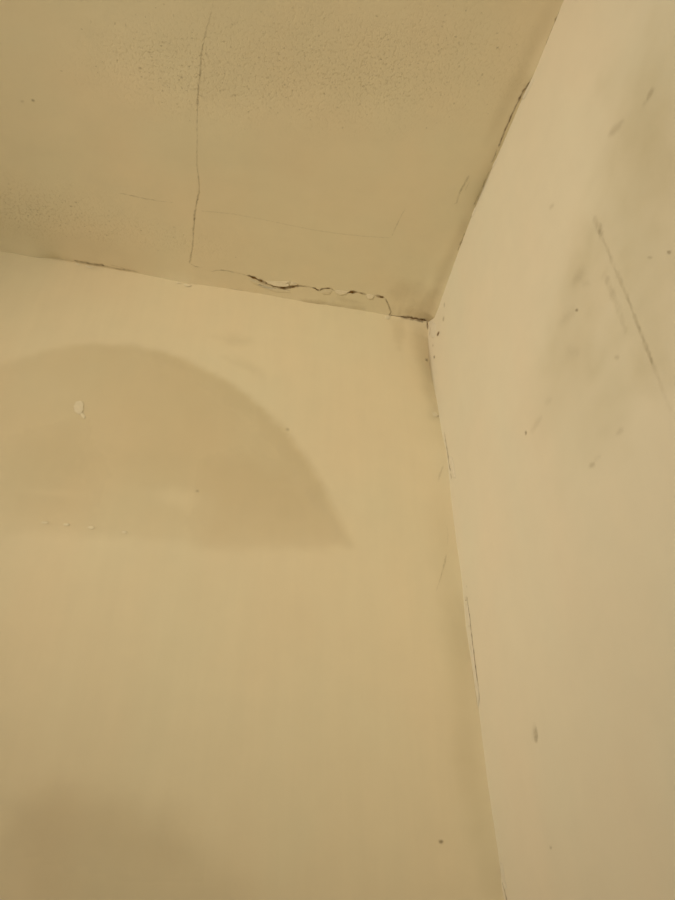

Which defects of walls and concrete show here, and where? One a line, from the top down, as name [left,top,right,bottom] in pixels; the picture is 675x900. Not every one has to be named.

crack [249,275,436,338]